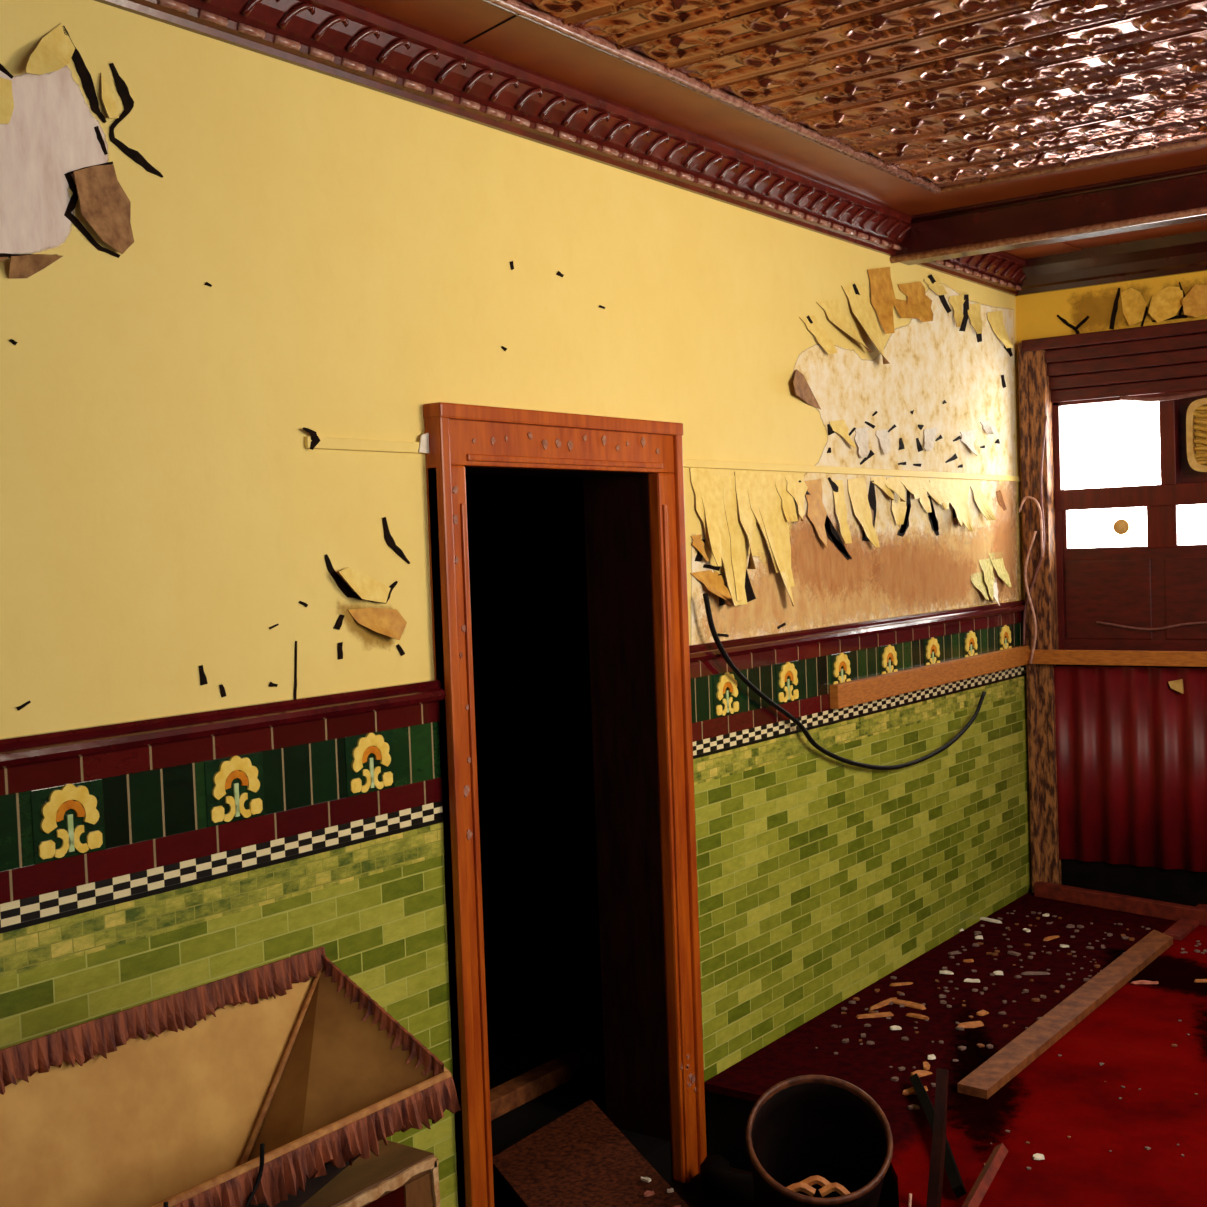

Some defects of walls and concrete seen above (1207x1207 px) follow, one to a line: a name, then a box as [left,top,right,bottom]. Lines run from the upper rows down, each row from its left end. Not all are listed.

peeling [0,23,163,278]
peeling [1121,285,1207,326]
peeling [690,267,1017,645]
peeling [339,567,407,645]
peeling [199,665,226,697]